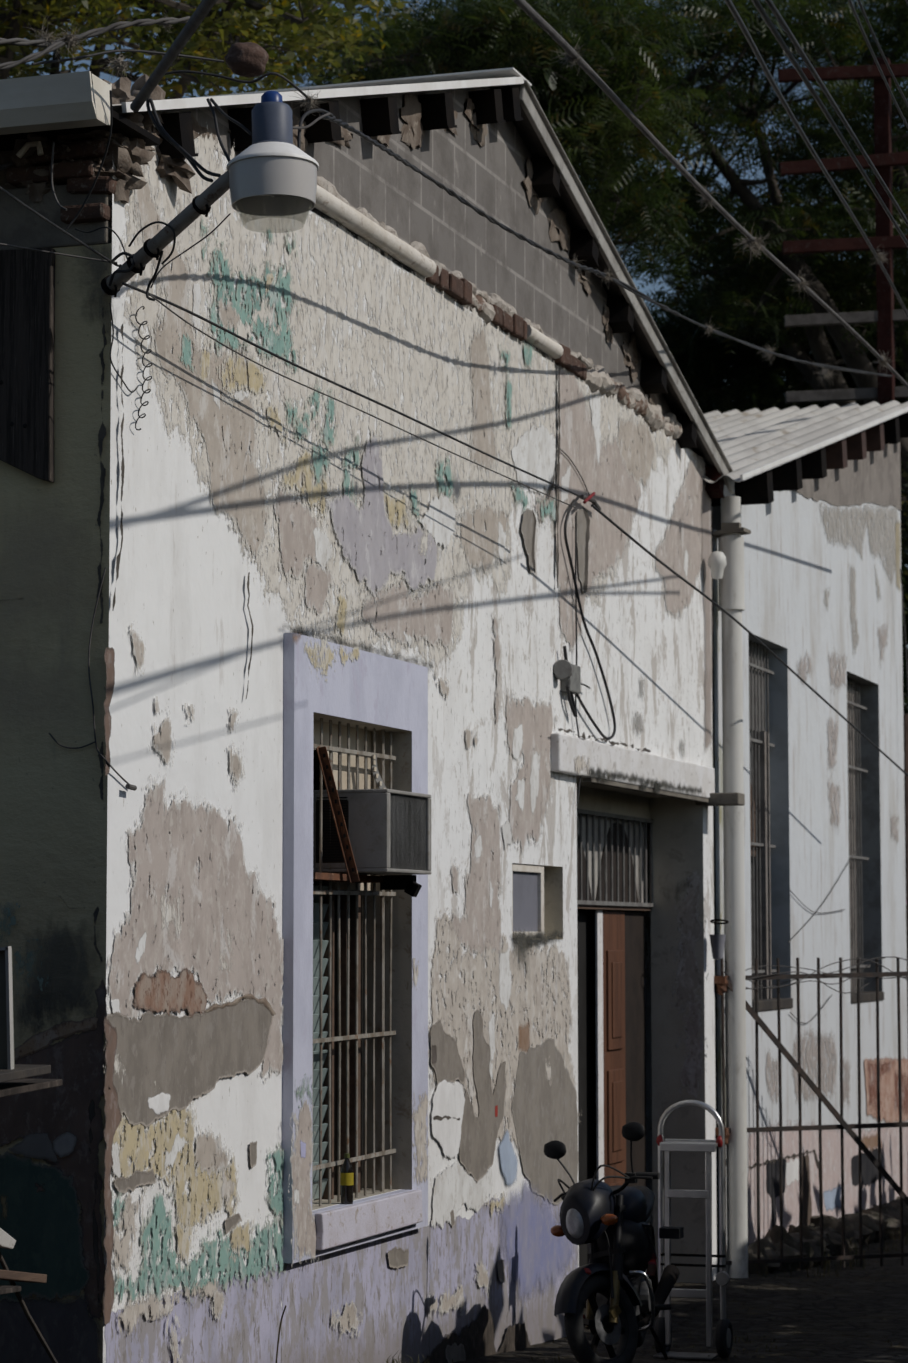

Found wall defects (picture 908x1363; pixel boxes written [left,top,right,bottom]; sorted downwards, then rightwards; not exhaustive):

peeling [130,166,657,681]
peeling [654,454,706,621]
peeling [0,696,322,1363]
peeling [329,1300,363,1339]
peeling [388,1247,409,1269]
peeling [410,610,581,1363]